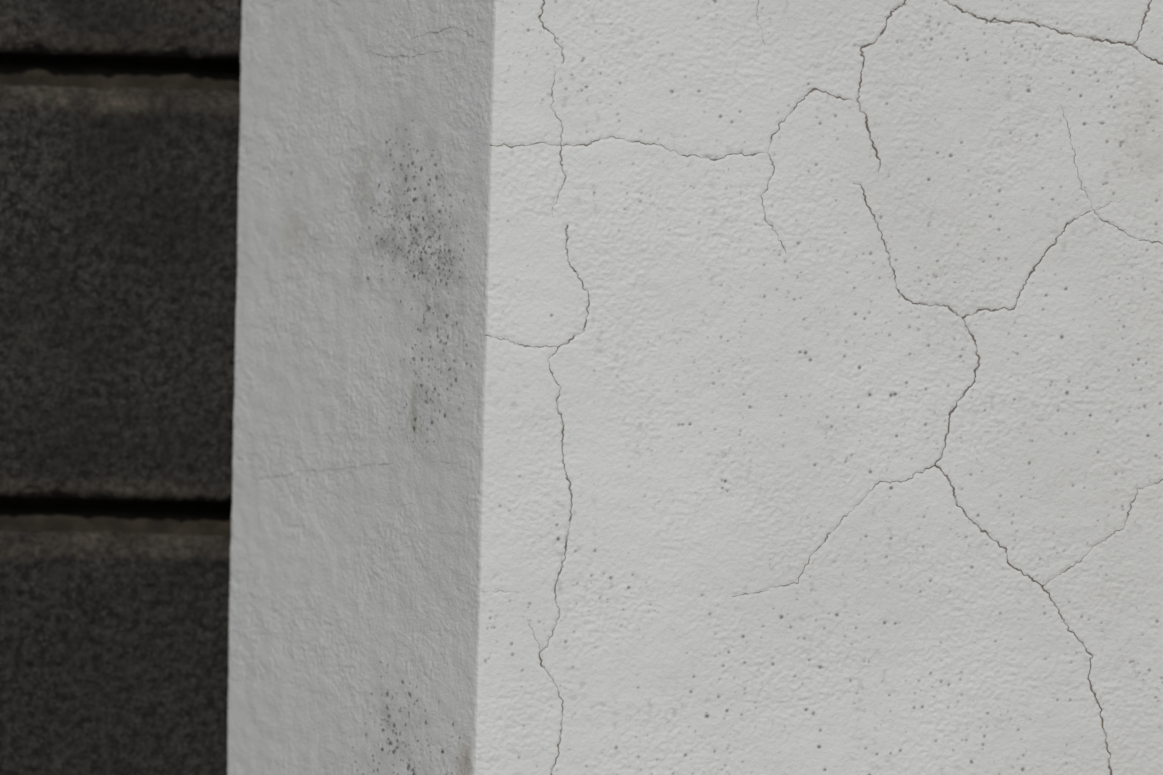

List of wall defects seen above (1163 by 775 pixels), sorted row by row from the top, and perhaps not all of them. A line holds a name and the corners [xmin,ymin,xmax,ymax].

crack [490,0,600,184]
crack [485,225,590,599]
crack [633,0,1163,775]